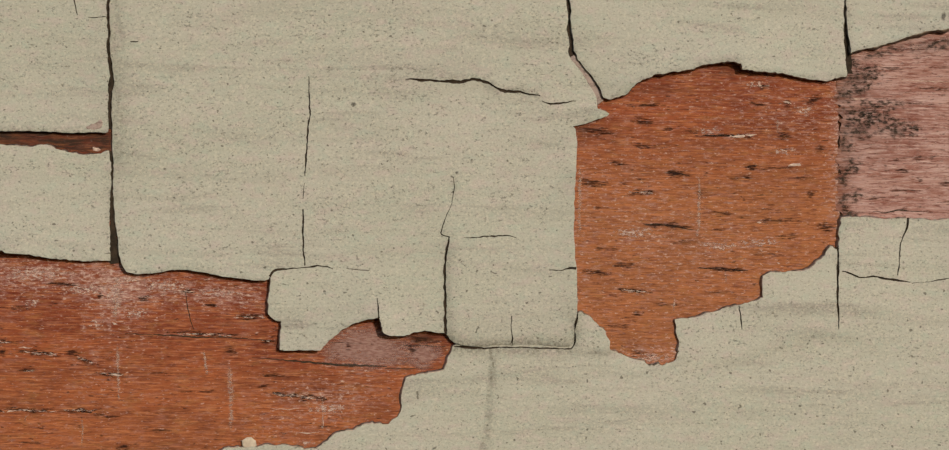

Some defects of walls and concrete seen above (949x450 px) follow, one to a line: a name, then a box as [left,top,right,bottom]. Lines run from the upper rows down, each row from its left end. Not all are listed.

crack [74,0,138,264]
peeling [0,119,455,450]
crack [269,76,369,277]
crack [405,78,572,105]
crack [440,177,578,350]
crack [566,0,603,105]
peeling [573,31,949,365]
crack [843,7,853,74]
crack [836,218,949,330]